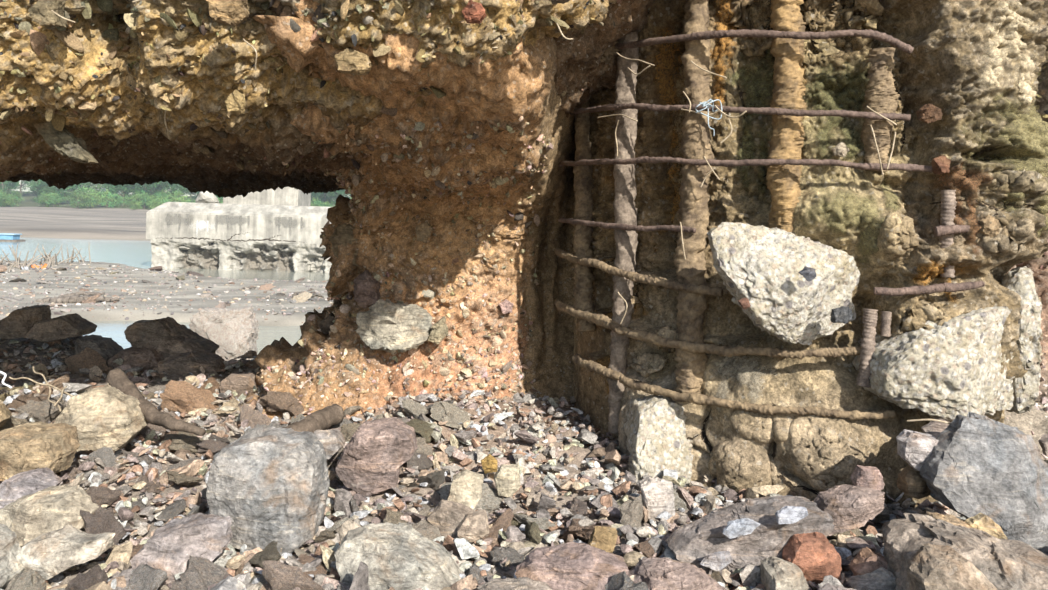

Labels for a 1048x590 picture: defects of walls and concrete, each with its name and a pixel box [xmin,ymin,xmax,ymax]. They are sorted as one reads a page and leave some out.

corrosion [654,27,684,233]
spalling [671,64,687,191]
corrosion [712,0,738,103]
spalling [728,0,773,63]
water stain [807,67,866,159]
spalling [800,0,884,66]
water stain [967,0,1048,177]
water stain [801,182,900,263]
corrosion [596,355,610,368]
spalling [629,326,678,381]
spalling [901,305,952,332]